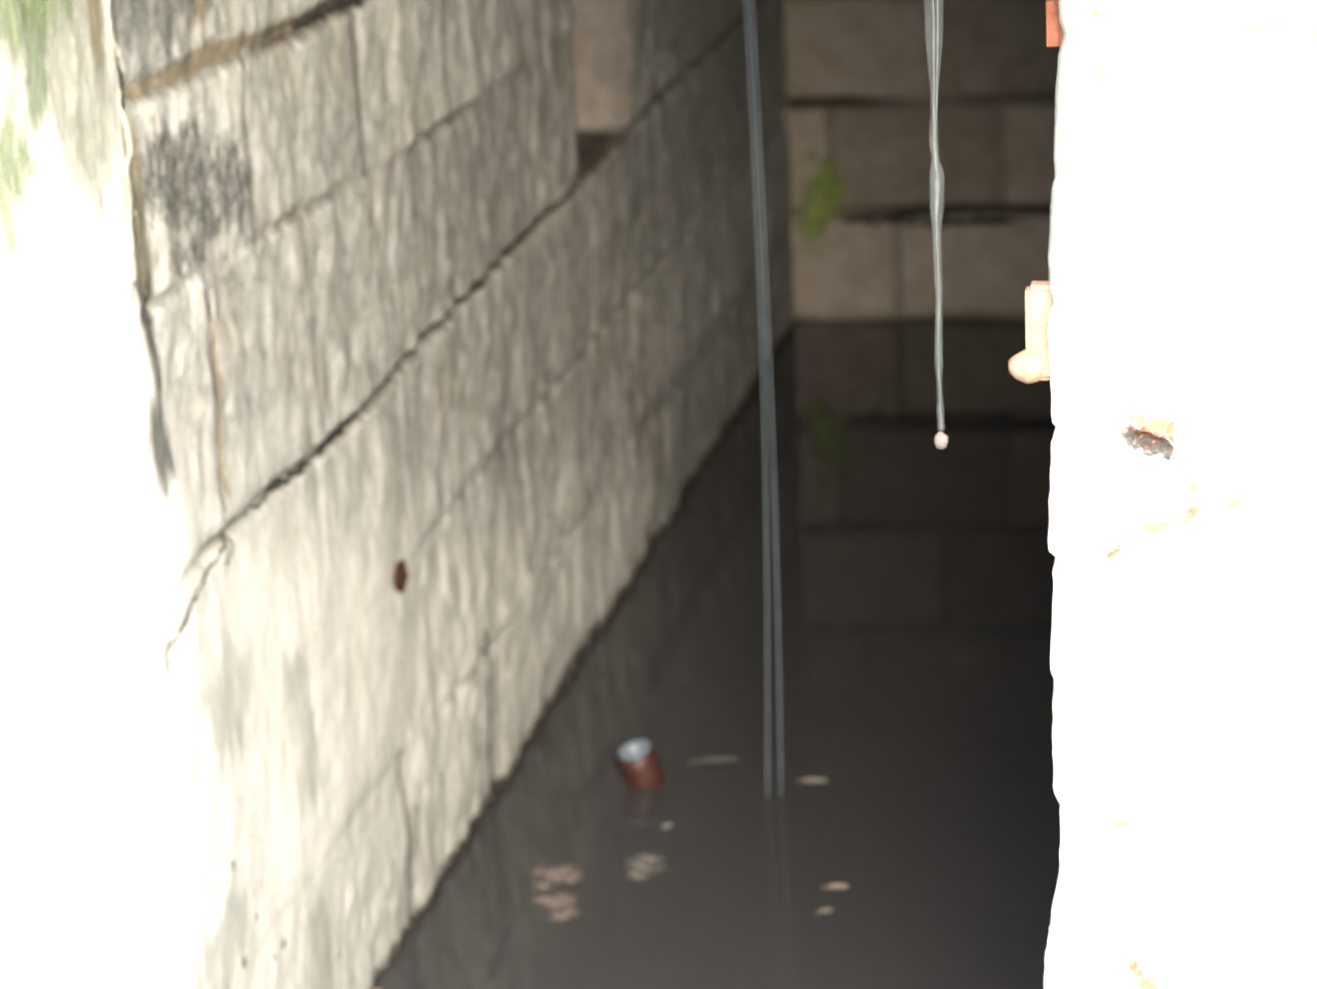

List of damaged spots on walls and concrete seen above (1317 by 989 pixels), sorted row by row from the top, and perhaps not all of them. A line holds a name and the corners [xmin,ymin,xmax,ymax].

leakage [0,0,47,257]
leakage [89,0,294,102]
leakage [125,117,253,496]
crack [166,202,560,692]
spalling [1104,404,1203,564]